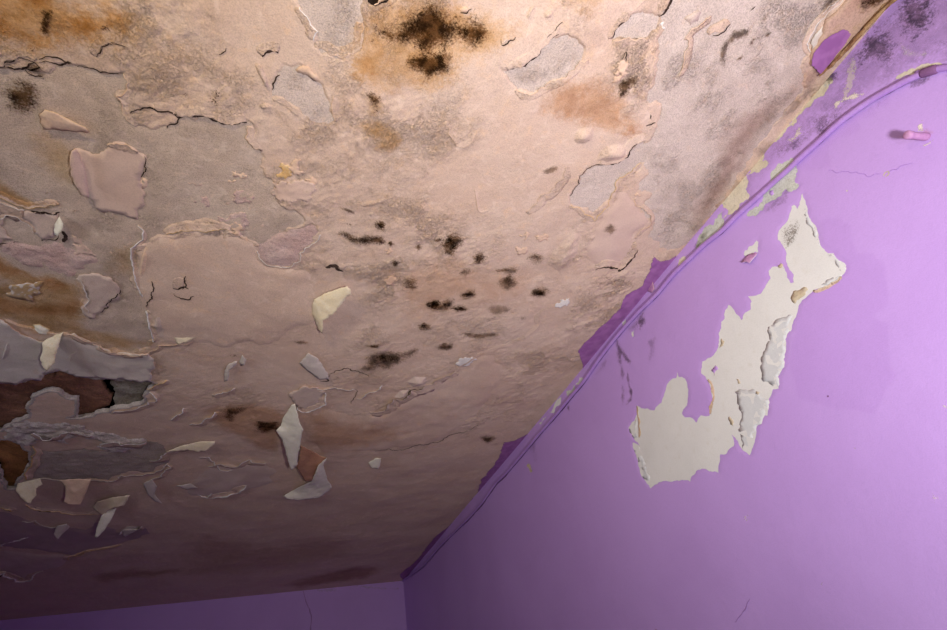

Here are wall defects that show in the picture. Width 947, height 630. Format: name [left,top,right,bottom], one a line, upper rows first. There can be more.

damp [7,82,38,112]
peeling [295,0,365,59]
damp [372,5,486,78]
peeling [503,22,589,100]
peeling [0,65,351,415]
damp [339,222,392,246]
damp [436,233,463,255]
peeling [569,0,846,488]
damp [426,292,474,311]
damp [365,345,414,370]
peeling [276,298,570,501]
peeling [0,420,232,557]